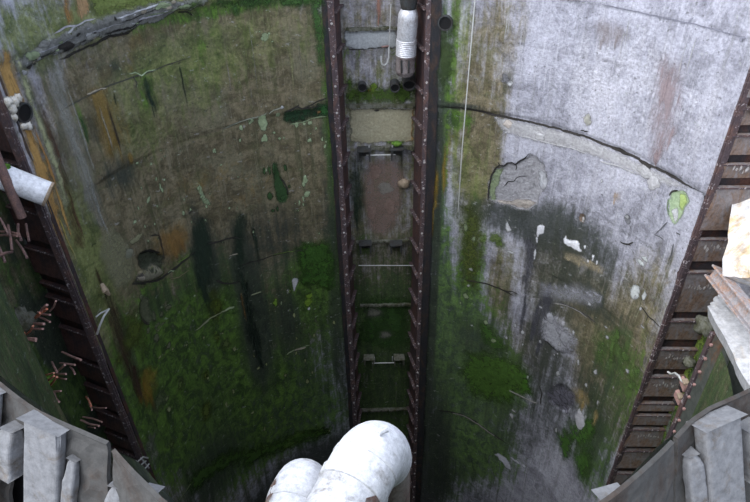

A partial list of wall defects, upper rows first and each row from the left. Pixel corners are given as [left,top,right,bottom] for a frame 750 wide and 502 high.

spalling [15,0,208,75]
corrosion [0,51,74,253]
crack [488,156,527,198]
crack [448,107,698,191]
peeling [488,117,689,224]
spalling [133,220,165,274]
damp [191,218,214,320]
damp [235,214,263,367]
damp [520,239,553,355]